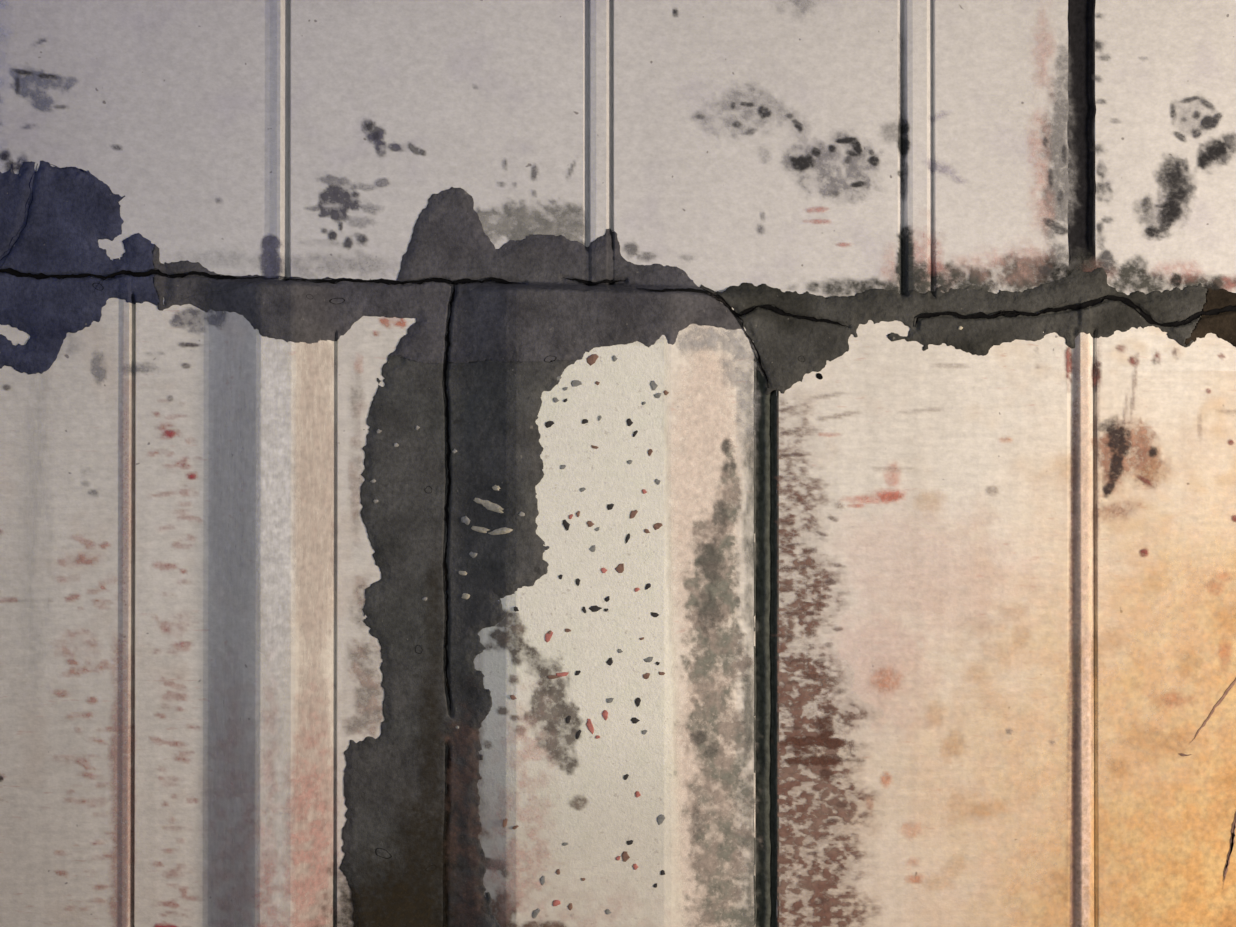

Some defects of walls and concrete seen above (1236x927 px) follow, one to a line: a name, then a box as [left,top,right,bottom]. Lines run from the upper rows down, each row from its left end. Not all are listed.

water stain [0,151,27,170]
water stain [722,89,802,131]
water stain [785,134,879,195]
water stain [810,55,1236,296]
crack [563,277,849,387]
crack [915,295,1236,327]
crack [0,164,526,927]
water stain [293,343,449,927]
water stain [674,328,757,927]
corrosion [777,449,869,927]
water stain [1069,675,1077,927]
corrosion [1029,347,1236,927]